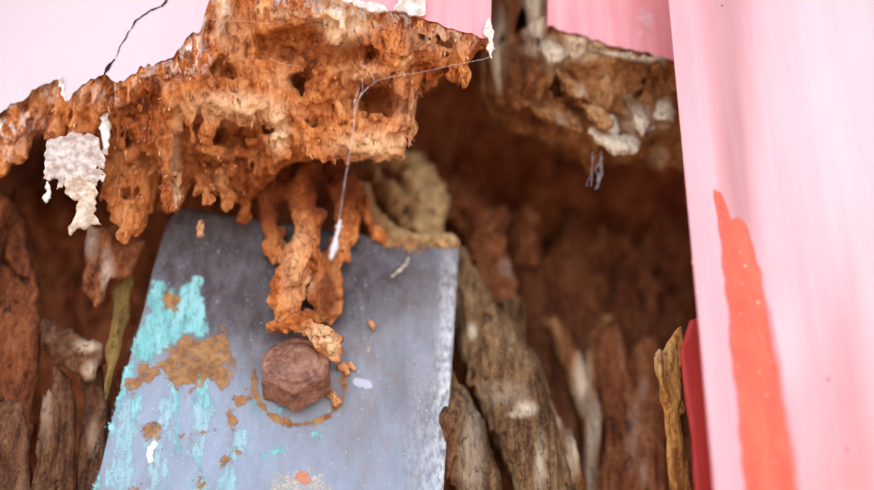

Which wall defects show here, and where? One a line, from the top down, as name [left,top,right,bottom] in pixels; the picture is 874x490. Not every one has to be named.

peeling [342,0,426,17]
crack [104,0,167,74]
peeling [483,17,496,59]
peeling [58,75,66,101]
peeling [42,112,111,235]
corrosion [376,232,430,256]
corrosion [160,290,181,313]
peeling [87,273,285,490]
corrosion [120,326,348,431]
corrosion [133,420,164,441]